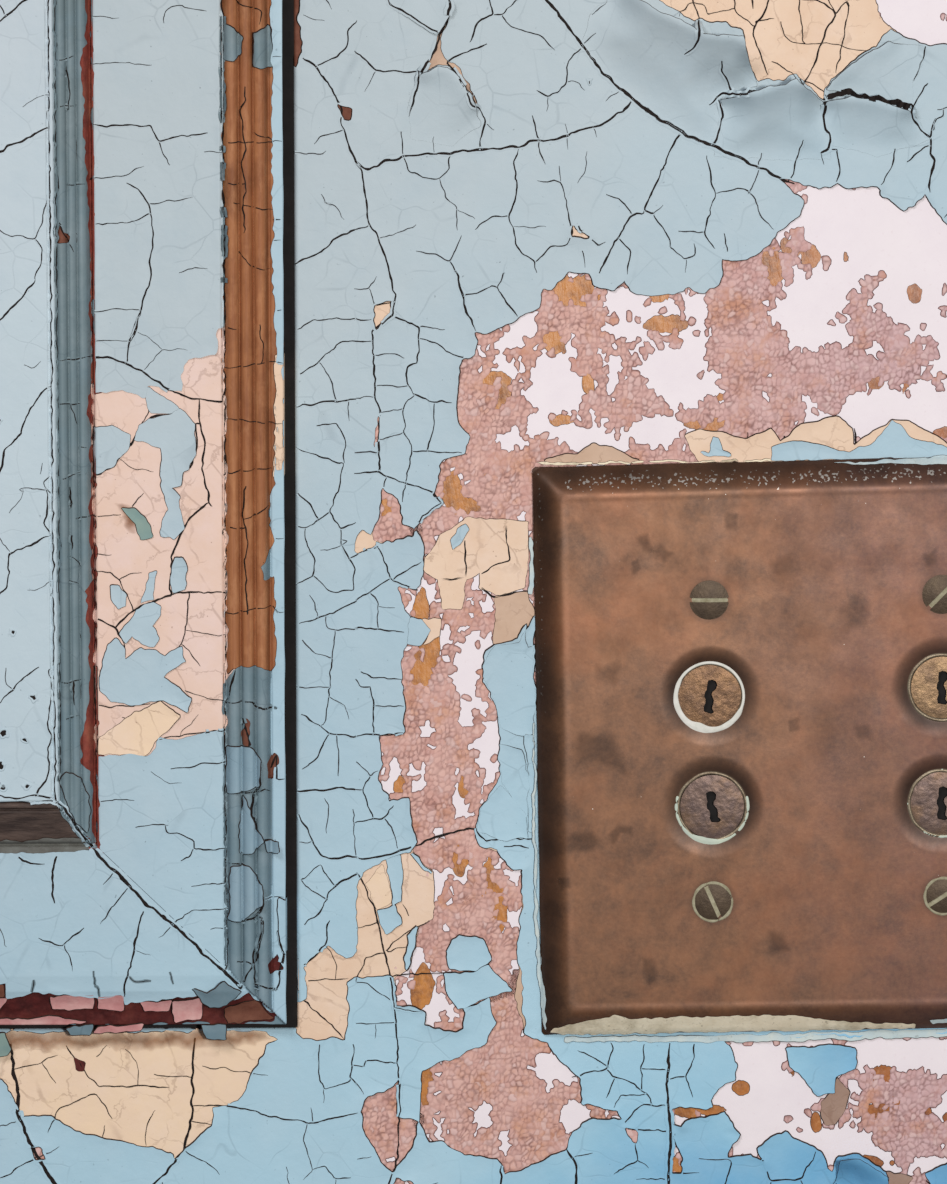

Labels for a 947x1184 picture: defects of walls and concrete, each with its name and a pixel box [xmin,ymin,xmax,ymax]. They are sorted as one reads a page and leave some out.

peeling [338,105,351,120]
peeling [428,26,477,104]
crack [679,0,947,192]
crack [0,0,285,997]
peeling [0,0,302,854]
crack [295,0,805,1184]
peeling [268,179,947,1184]
peeling [225,718,286,923]
crack [0,1044,61,1184]
peeling [0,981,281,1158]
crack [47,1038,358,1184]
crack [765,1152,817,1184]